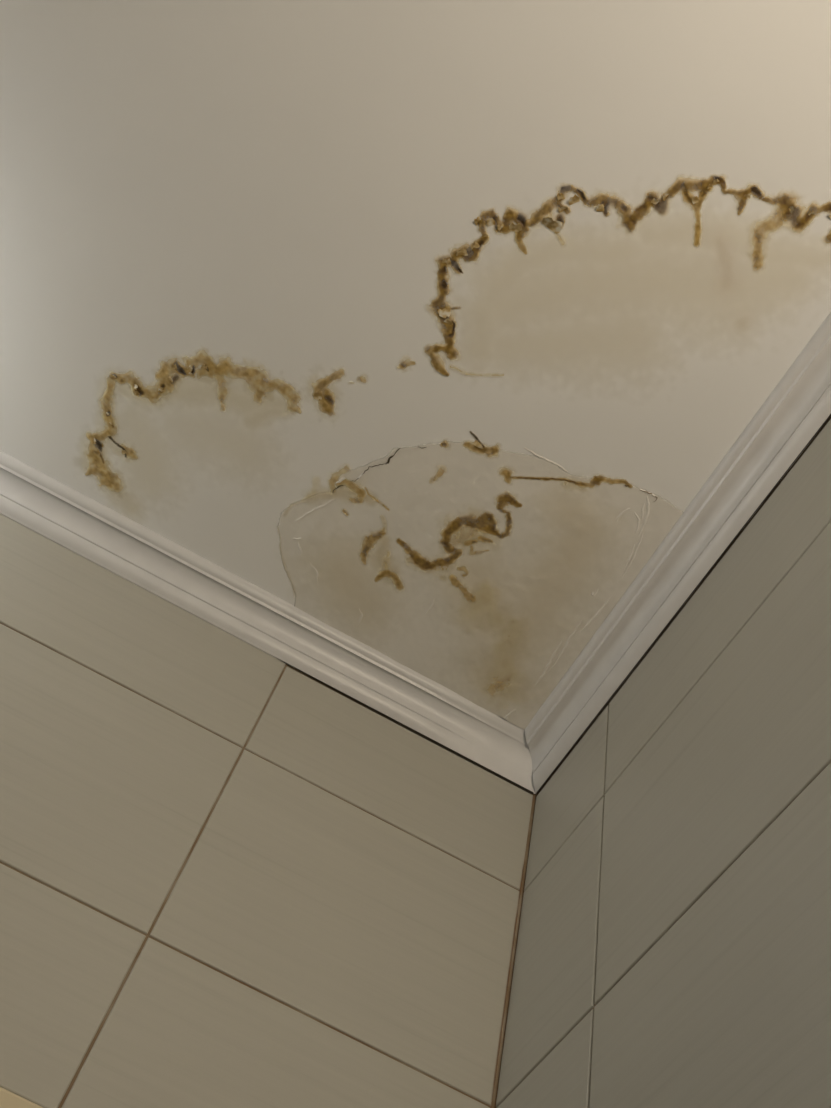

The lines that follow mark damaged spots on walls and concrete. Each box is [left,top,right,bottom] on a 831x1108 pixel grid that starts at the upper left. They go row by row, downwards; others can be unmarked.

water stain [425,176,831,377]
water stain [312,369,344,415]
water stain [85,352,301,491]
water stain [464,431,499,456]
water stain [360,531,385,564]
water stain [397,469,522,601]
water stain [375,570,403,590]